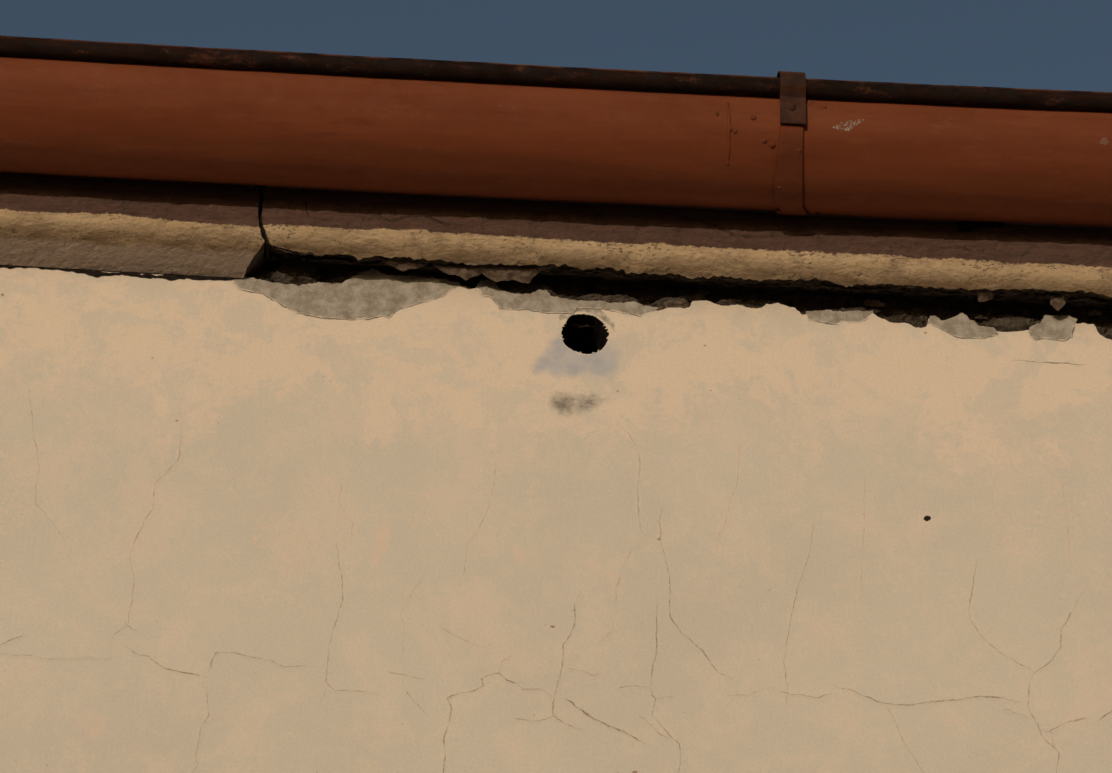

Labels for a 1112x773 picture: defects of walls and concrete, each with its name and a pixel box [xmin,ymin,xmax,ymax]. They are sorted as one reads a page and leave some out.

crack [255,185,272,248]
flaking render [233,243,1112,341]
crack [125,645,306,773]
crack [386,506,733,773]
crack [832,558,1112,773]